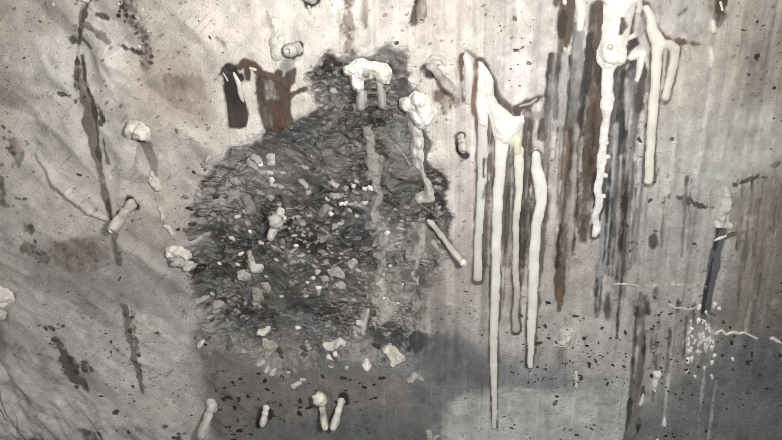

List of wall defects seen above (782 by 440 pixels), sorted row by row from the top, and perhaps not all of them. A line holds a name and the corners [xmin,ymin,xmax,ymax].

peeling [165,68,203,103]
water stain [503,0,588,262]
spalling [176,0,457,440]
water stain [591,65,651,338]
water stain [649,220,671,249]
water stain [664,169,691,244]
water stain [694,219,726,319]